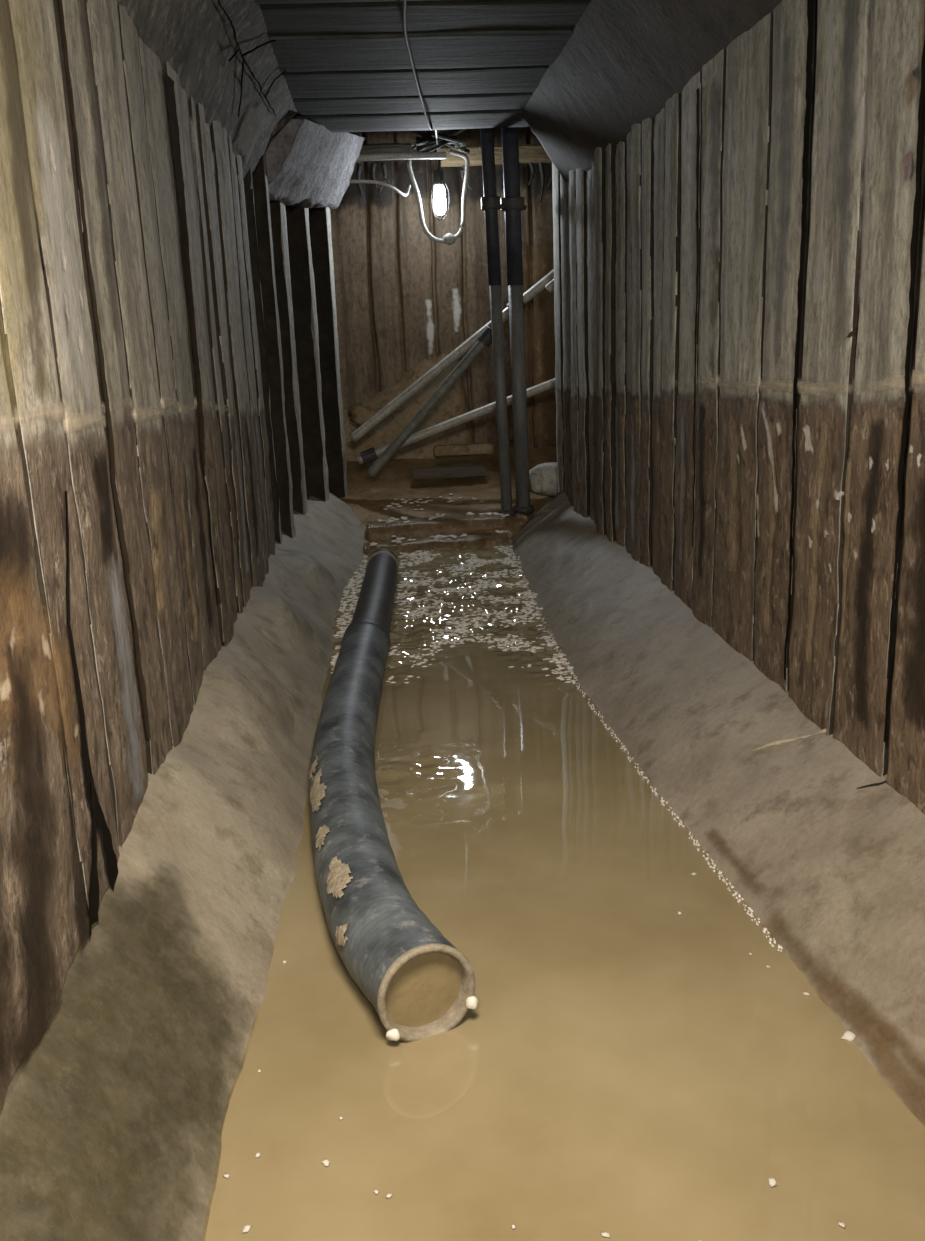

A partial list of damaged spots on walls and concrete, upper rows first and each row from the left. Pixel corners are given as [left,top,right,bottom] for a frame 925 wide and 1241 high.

crack [58,0,151,739]
leakage [654,112,672,304]
leakage [520,145,925,815]
leakage [710,66,754,345]
leakage [775,46,788,360]
leakage [814,0,873,302]
crack [65,491,118,943]
leakage [0,400,275,1241]